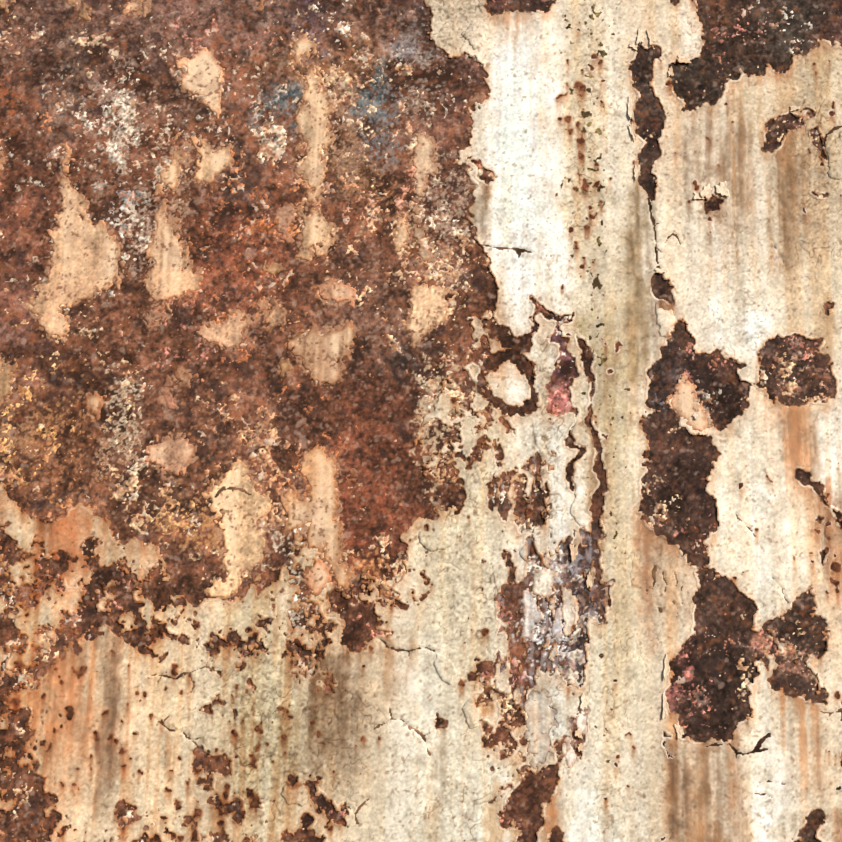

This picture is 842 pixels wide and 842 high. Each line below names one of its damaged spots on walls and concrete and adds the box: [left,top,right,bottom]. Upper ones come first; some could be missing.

spalling [558,116,585,159]
crack [479,244,551,258]
corrosion [0,0,616,842]
peeling [665,380,712,432]
spalling [814,517,841,594]